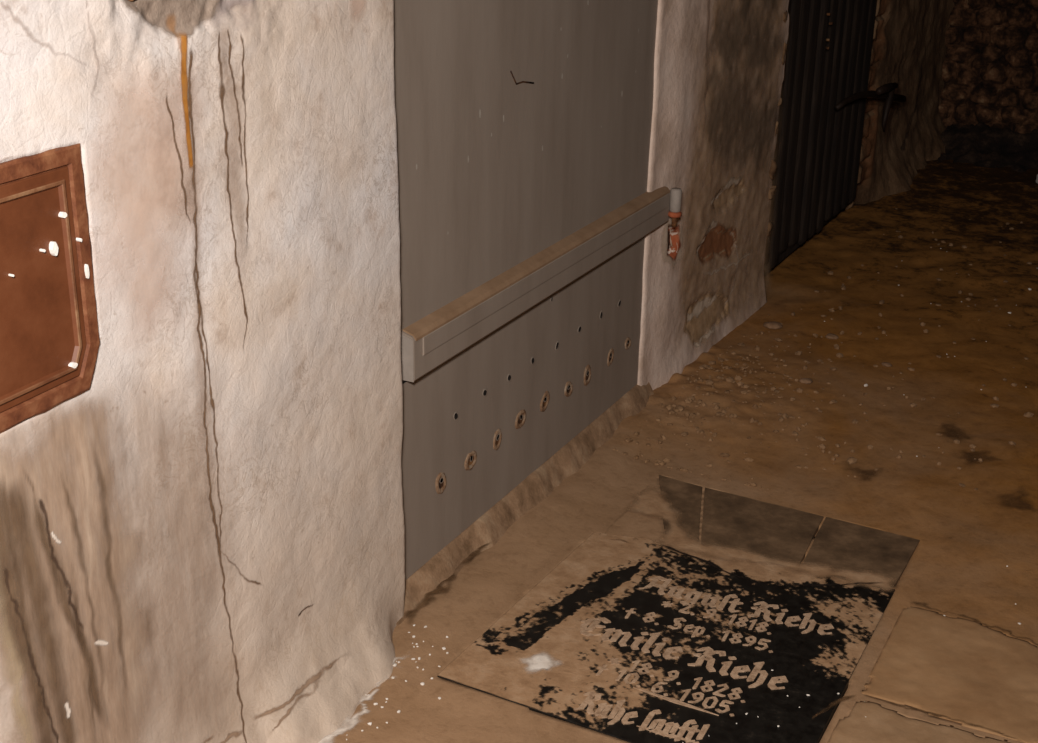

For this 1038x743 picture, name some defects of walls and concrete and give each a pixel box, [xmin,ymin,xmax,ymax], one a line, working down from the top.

spalling [124,0,254,37]
corrosion [180,35,193,167]
leakage [682,0,783,316]
spalling [662,221,682,266]
peeling [696,221,736,263]
leakage [0,404,148,743]
crack [204,662,334,743]